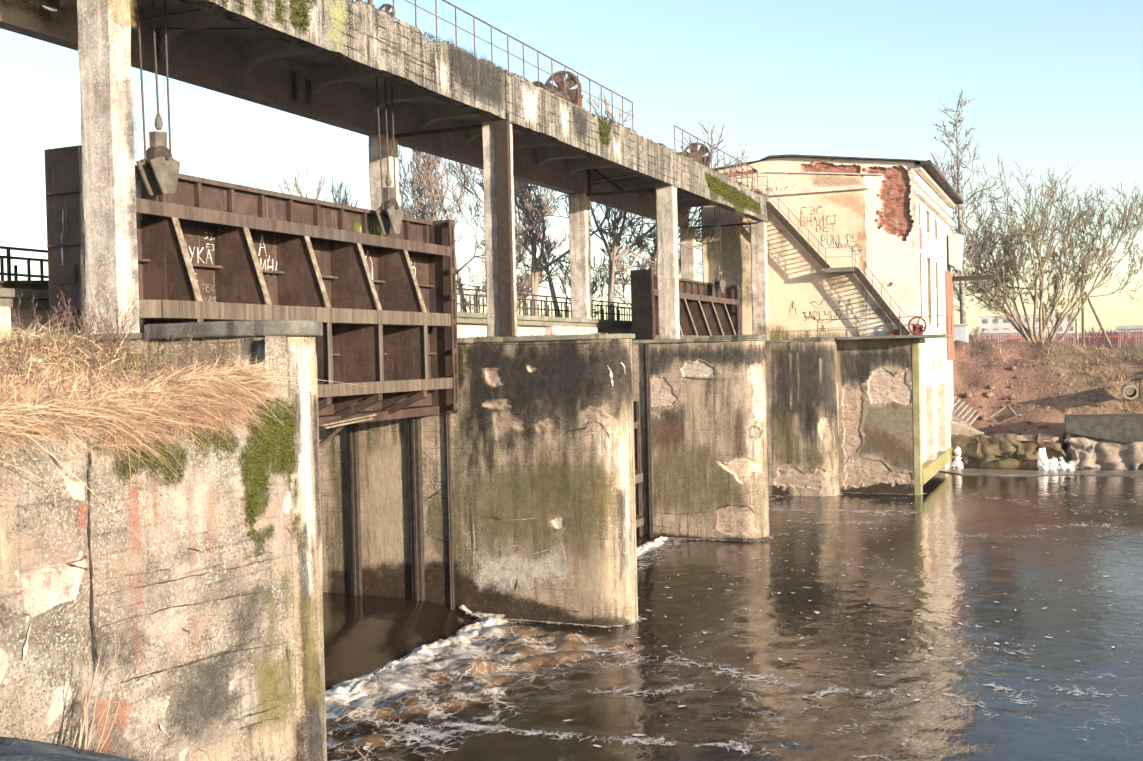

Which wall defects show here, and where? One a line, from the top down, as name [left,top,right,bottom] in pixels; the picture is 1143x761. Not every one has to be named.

flaking render [800,158,914,241]
peeling [482,368,554,442]
spalling [717,453,762,485]
peeling [745,364,766,440]
peeling [771,367,916,492]
damp [198,327,915,761]
spalling [14,550,87,622]
crack [47,436,296,761]
damp [176,588,262,738]